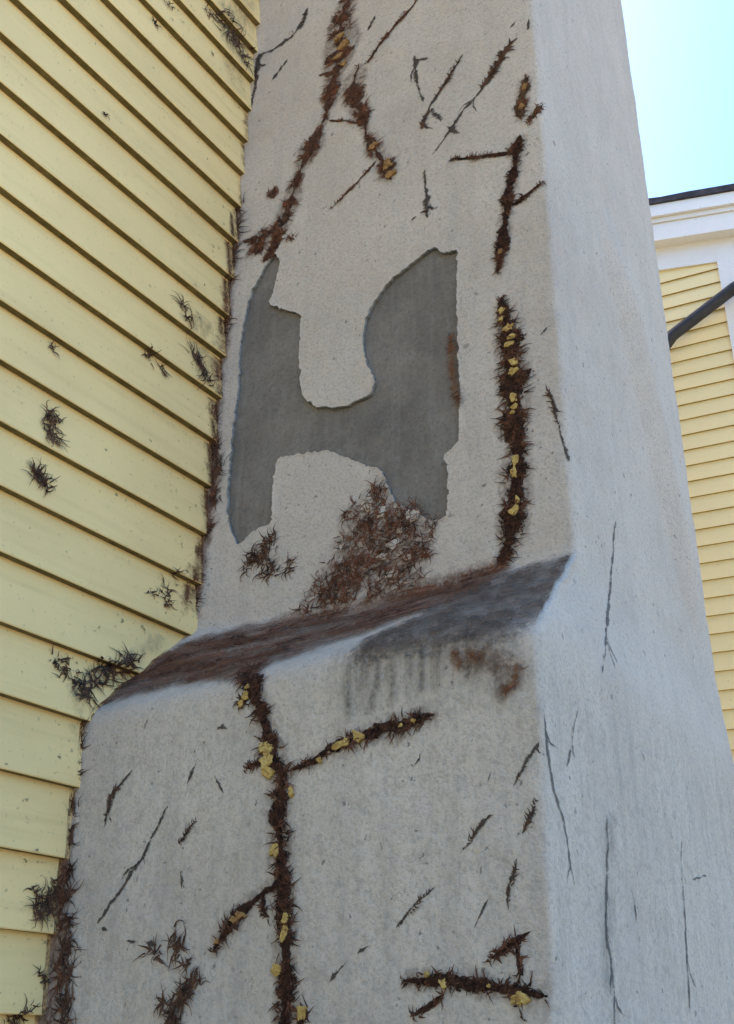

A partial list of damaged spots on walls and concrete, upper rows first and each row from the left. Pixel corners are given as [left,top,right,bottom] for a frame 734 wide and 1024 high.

crack [243,0,416,262]
crack [410,19,570,568]
spalling [225,246,463,617]
corrosion [93,553,530,709]
water stain [348,554,571,705]
corrosion [36,848,69,1024]
crack [208,660,435,1024]
crack [400,859,549,1022]